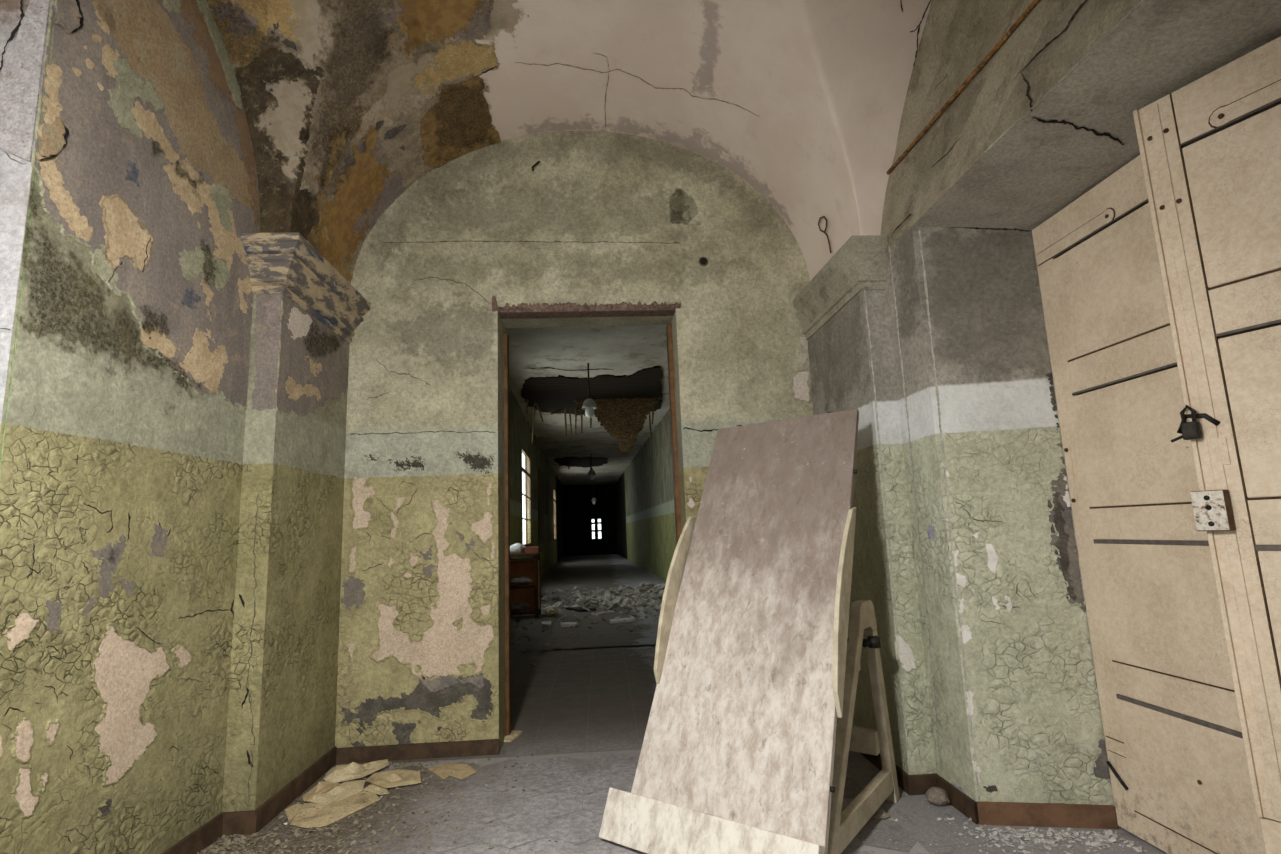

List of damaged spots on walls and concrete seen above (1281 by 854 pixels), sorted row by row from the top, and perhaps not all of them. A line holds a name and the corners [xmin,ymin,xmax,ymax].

crack [0,0,25,71]
crack [515,53,757,130]
crack [1018,0,1124,145]
peeling [31,0,350,418]
crack [83,503,171,542]
spalling [1046,372,1085,611]
peeling [0,717,61,819]
peeling [2,600,62,651]
crack [2,641,91,743]
peeling [90,622,193,820]
crack [135,491,258,809]
peeling [339,474,497,747]